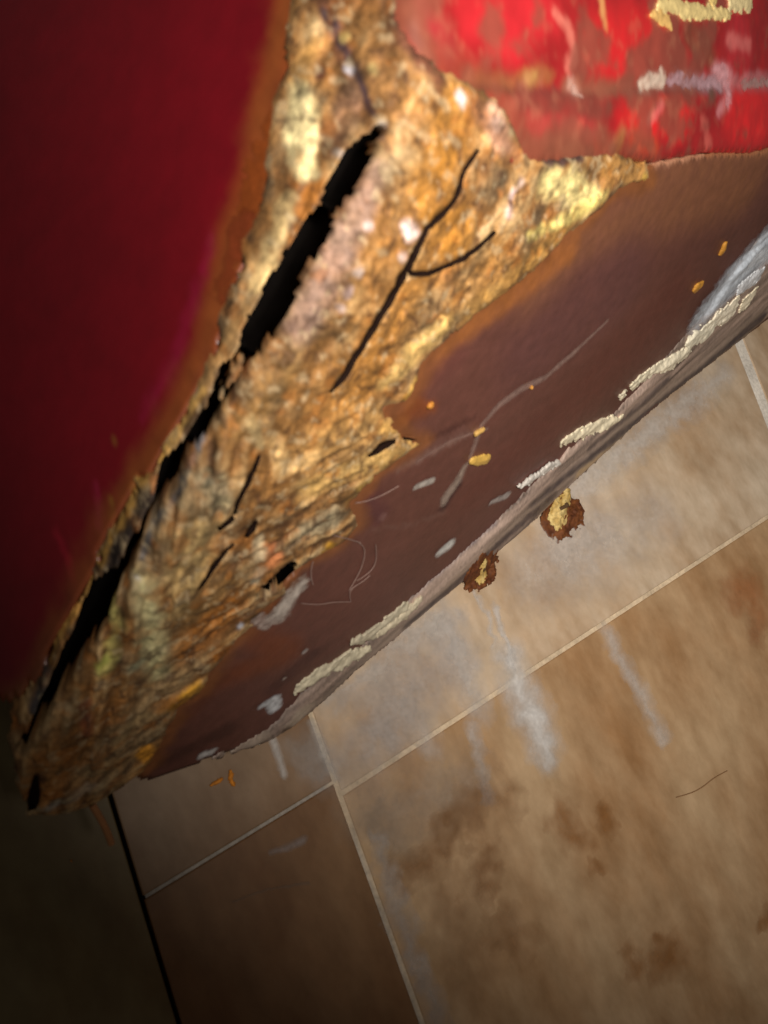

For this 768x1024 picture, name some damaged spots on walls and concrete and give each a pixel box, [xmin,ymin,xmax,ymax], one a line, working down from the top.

corrosion [217,108,274,303]
crack [330,149,496,393]
peeling [618,266,766,401]
crack [21,128,381,744]
peeling [490,414,624,504]
corrosion [540,488,585,544]
corrosion [463,550,499,593]
peeling [282,595,423,696]
peeling [259,696,281,713]
crack [27,775,40,811]